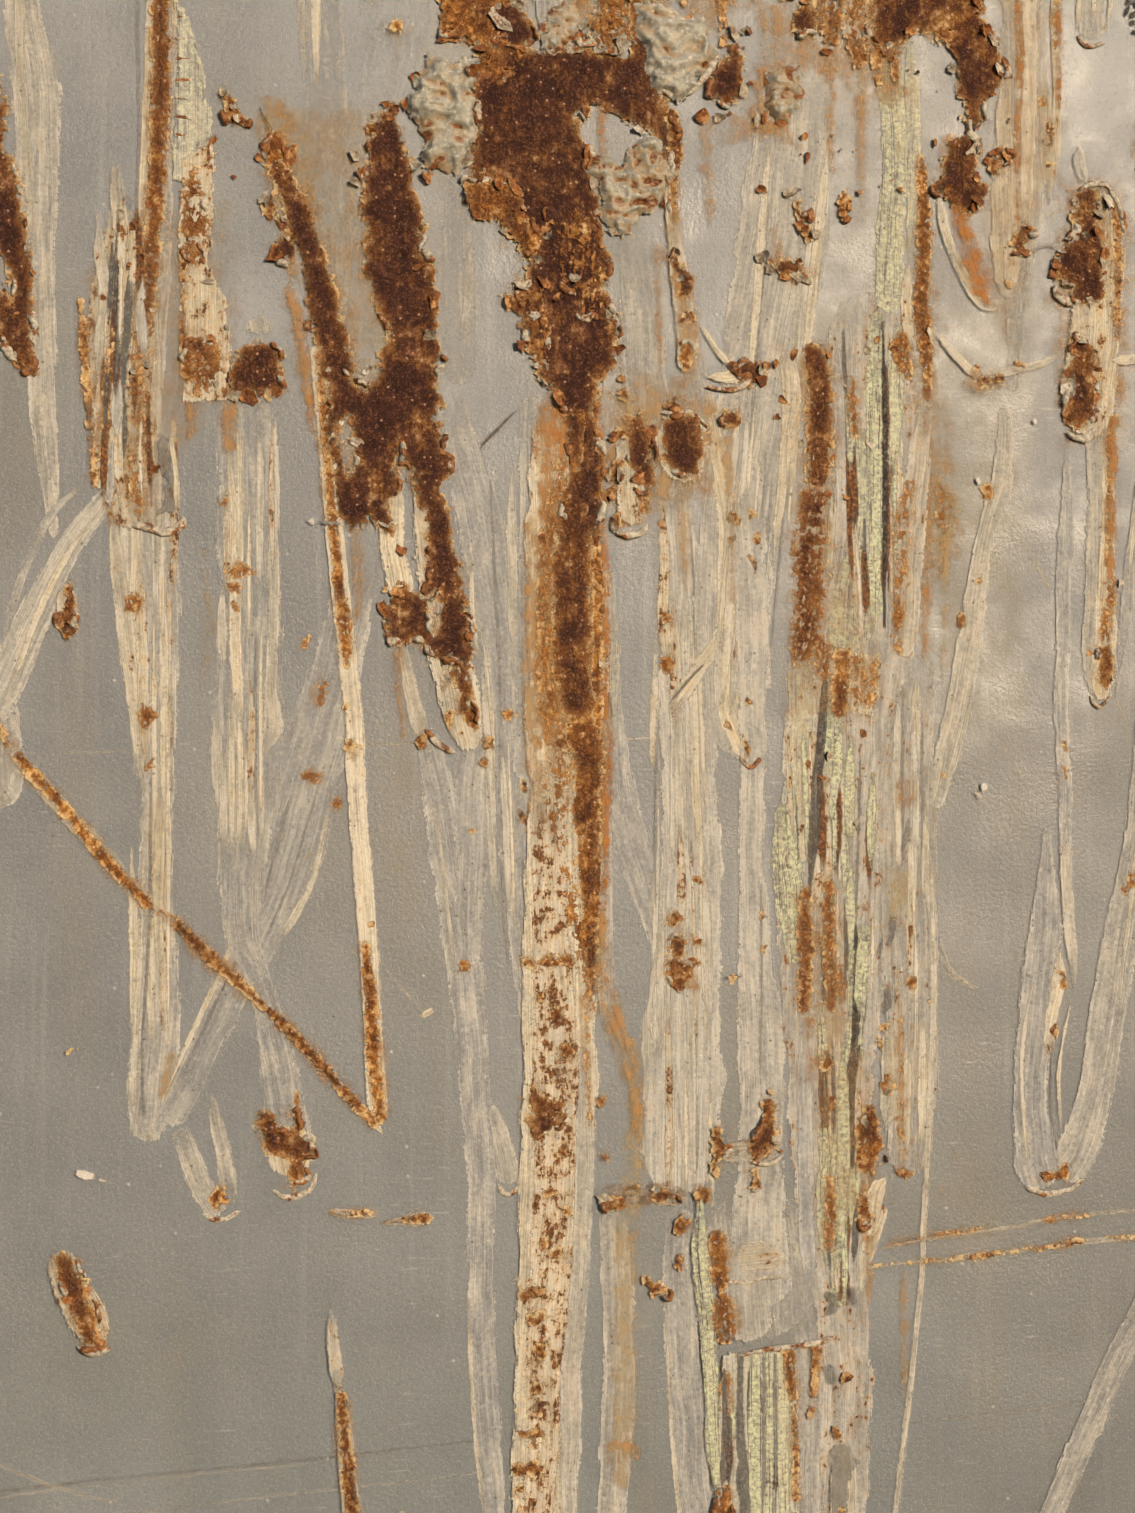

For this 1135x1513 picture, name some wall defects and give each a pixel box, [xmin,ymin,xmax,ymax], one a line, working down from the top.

peeling [702,326,780,392]
peeling [131,434,187,536]
rust [0,0,495,1134]
rust [436,0,1135,1135]
spalling [724,719,752,759]
peeling [76,1170,106,1182]
rust [823,1019,1135,1294]
rust [48,1250,112,1357]
rust [327,1320,363,1513]
rust [511,1381,548,1513]
peeling [703,1330,833,1513]
spalling [829,1443,860,1513]